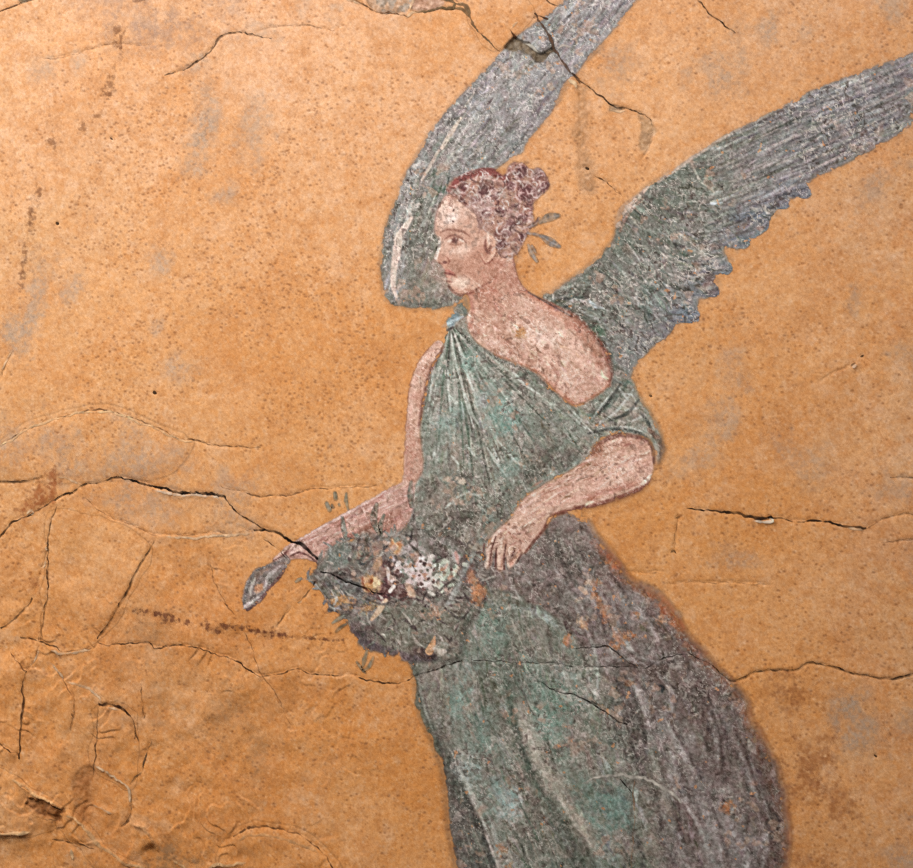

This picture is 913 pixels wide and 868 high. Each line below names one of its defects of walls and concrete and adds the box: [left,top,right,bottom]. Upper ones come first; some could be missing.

spalling [357,0,444,14]
crack [353,0,651,120]
crack [3,408,229,446]
crack [676,508,889,530]
crack [0,476,499,868]
crack [528,645,910,725]
crack [587,756,681,839]